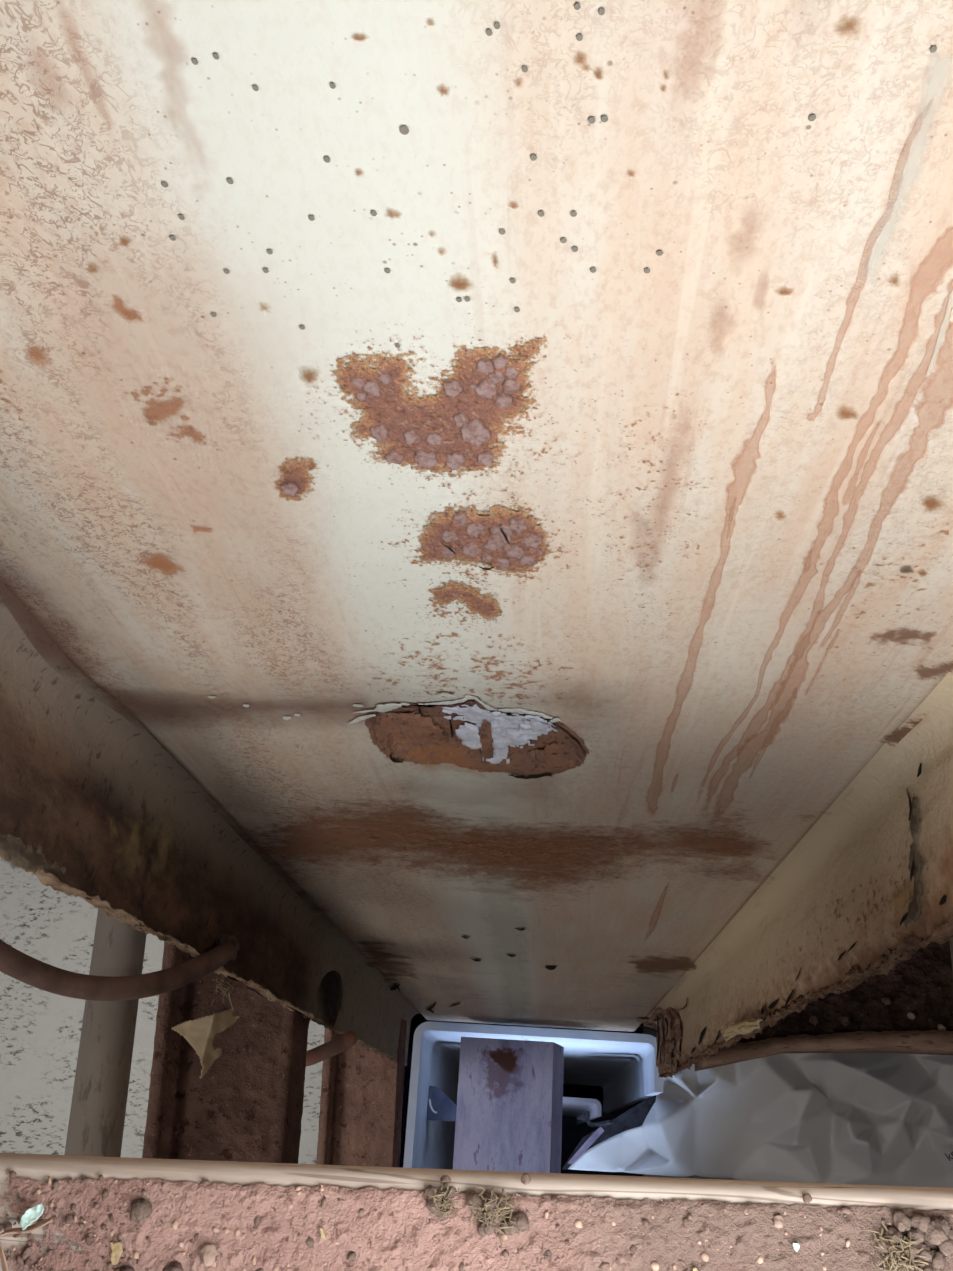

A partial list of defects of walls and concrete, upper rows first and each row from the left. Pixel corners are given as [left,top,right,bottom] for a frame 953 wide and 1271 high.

corrosion [126,378,215,444]
corrosion [839,408,856,419]
corrosion [274,457,320,501]
corrosion [303,336,579,705]
corrosion [924,499,942,511]
corrosion [854,558,926,591]
corrosion [871,629,934,644]
corrosion [915,661,953,680]
peeling [349,693,589,779]
corrosion [882,720,922,746]
peeling [636,1007,682,1073]
peeling [721,1019,763,1042]